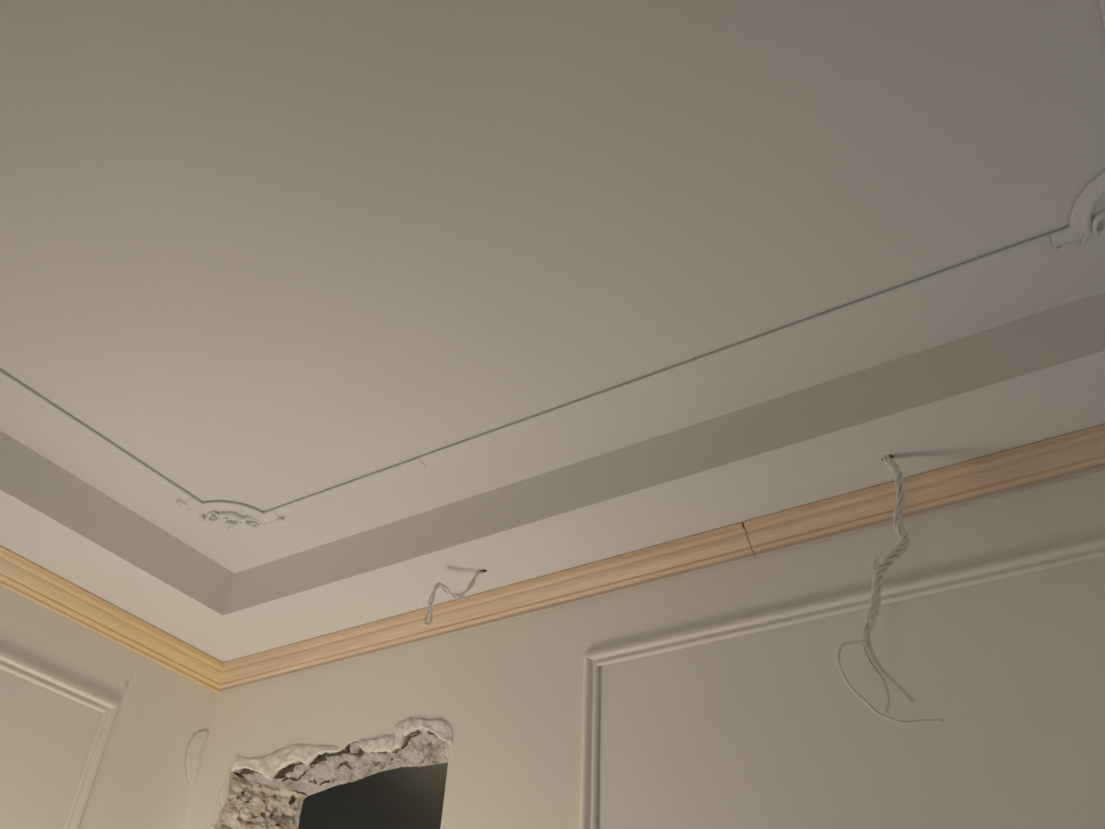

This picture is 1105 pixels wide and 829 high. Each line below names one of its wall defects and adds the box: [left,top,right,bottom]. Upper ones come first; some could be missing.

spalling [209,728,450,829]